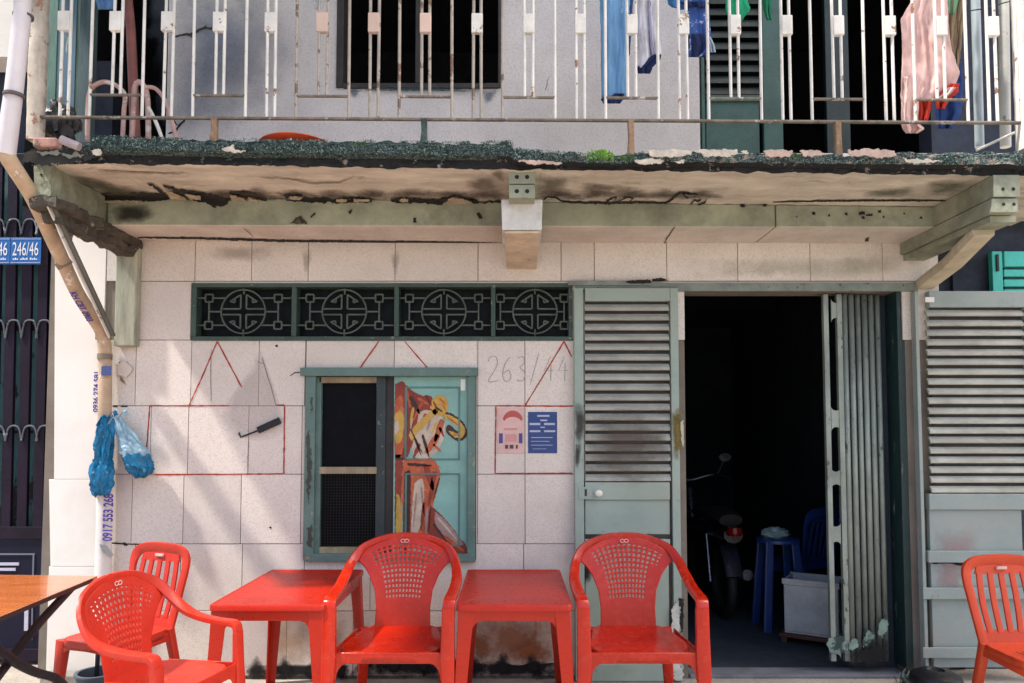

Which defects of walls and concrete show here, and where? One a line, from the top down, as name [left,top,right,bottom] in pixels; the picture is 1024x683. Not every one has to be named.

flaking render [634,148,749,165]
flaking render [763,149,825,158]
flaking render [848,148,942,164]
spalling [101,183,267,208]
leakage [243,176,382,198]
leakage [438,172,501,198]
leakage [587,185,716,198]
leakage [934,183,962,193]
peeling [826,616,889,654]
leakage [472,656,510,675]
leakage [524,656,540,675]